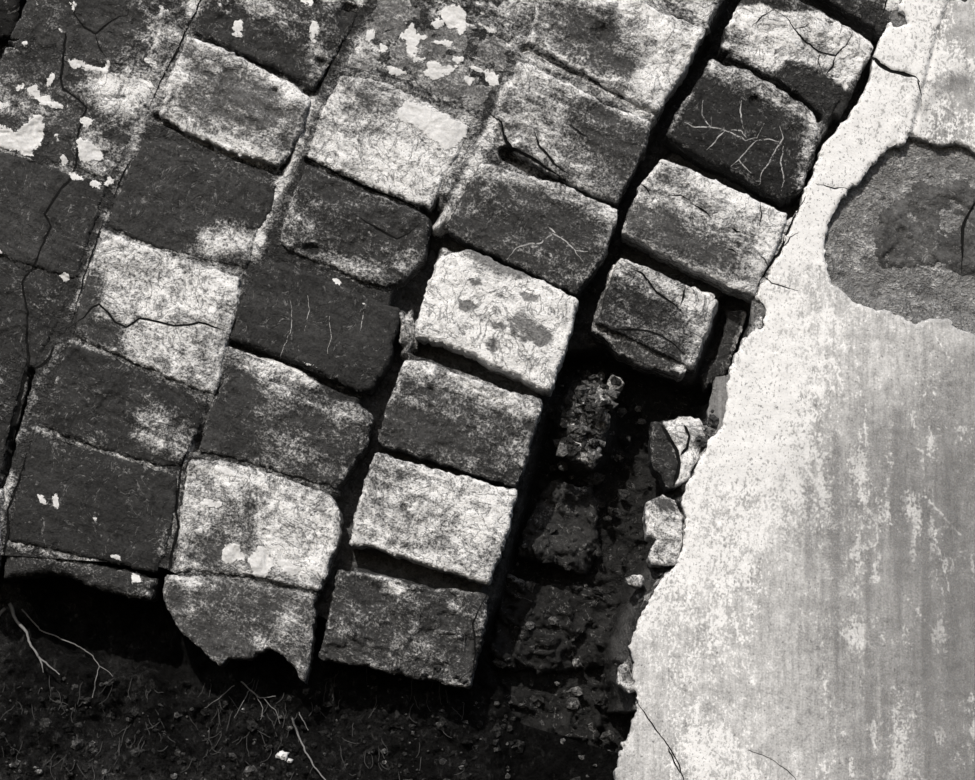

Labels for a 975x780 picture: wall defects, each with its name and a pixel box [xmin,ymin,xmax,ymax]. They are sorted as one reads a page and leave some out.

spalling [824,138,975,334]
crack [0,0,225,579]
spalling [547,369,646,521]
spalling [695,374,730,447]
spalling [554,681,606,728]
spalling [600,730,621,752]
crack [637,702,684,780]